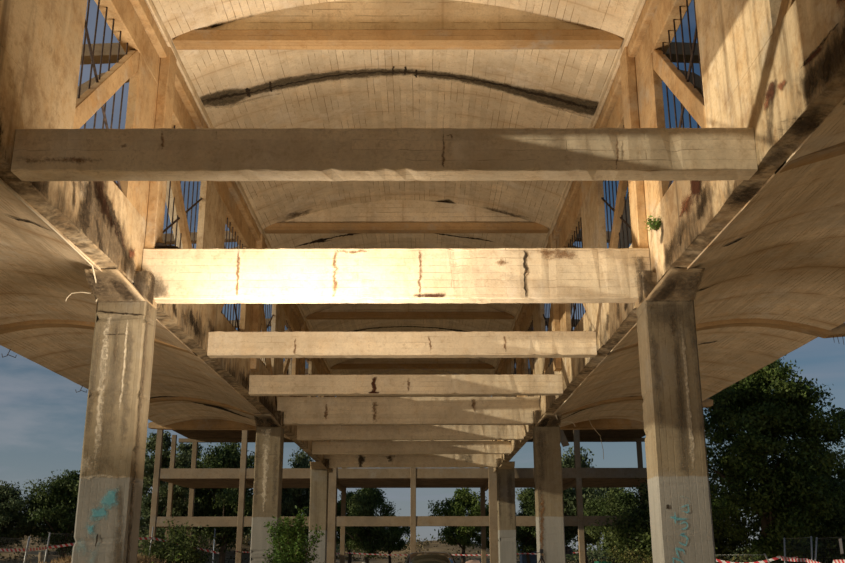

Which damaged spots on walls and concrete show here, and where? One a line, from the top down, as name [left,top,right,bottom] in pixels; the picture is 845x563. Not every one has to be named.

water stain [799,27,845,101]
crack [200,66,598,118]
rust [764,80,785,141]
water stain [783,108,827,139]
water stain [727,184,762,204]
crack [434,233,493,242]
crack [234,254,242,295]
crack [292,233,367,297]
crack [414,252,445,298]
crack [522,251,530,296]
crack [368,377,379,419]